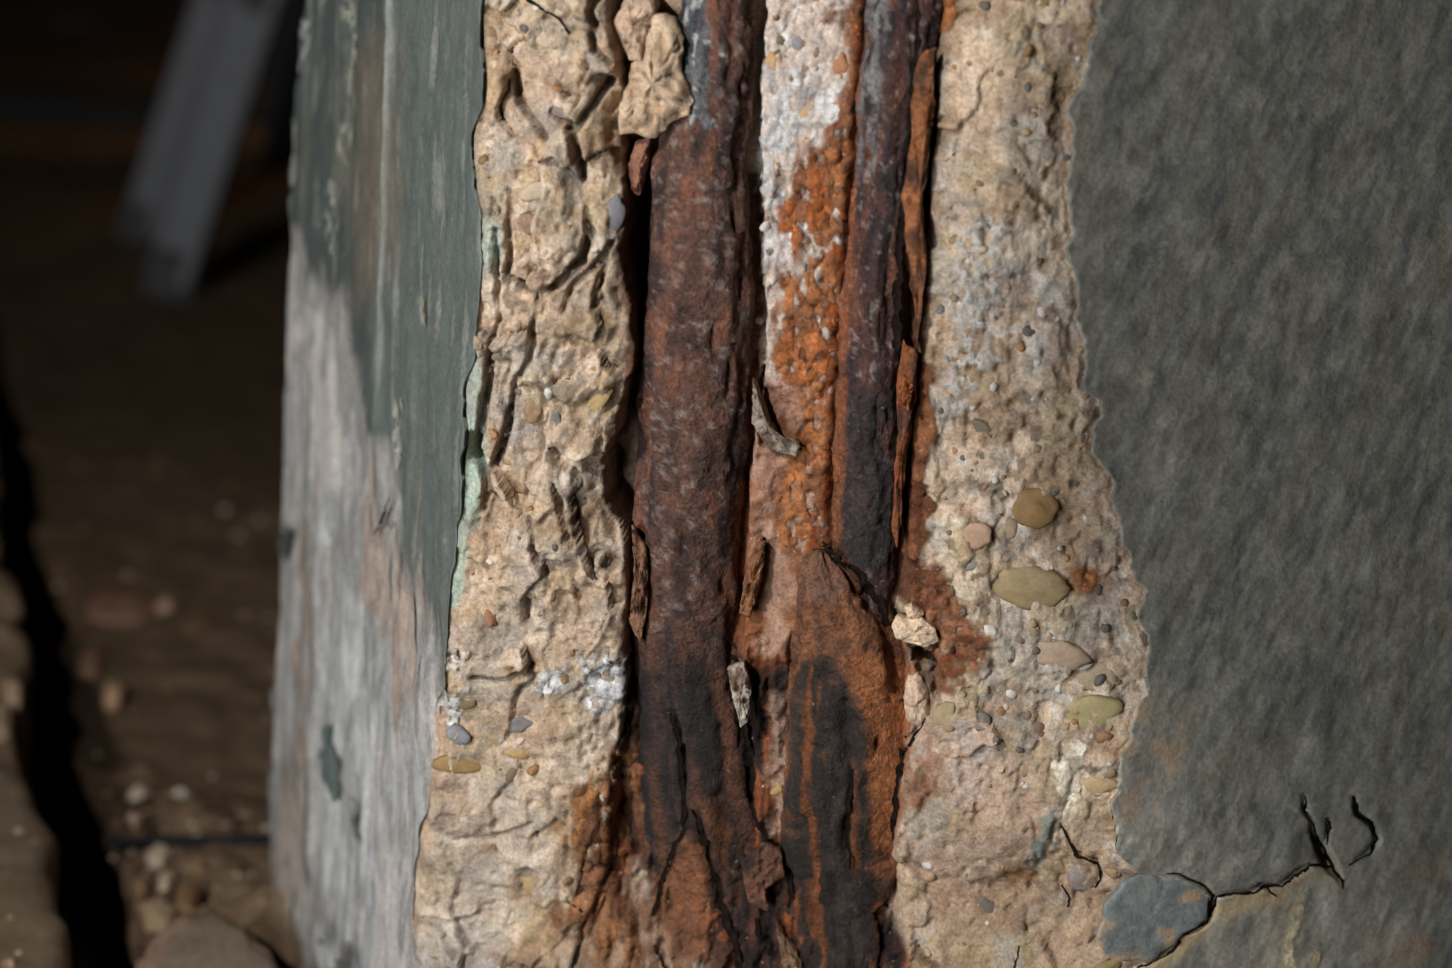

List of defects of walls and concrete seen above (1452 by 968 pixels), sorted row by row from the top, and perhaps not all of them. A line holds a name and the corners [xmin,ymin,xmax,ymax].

corrosion [940,0,957,31]
corrosion [752,2,865,557]
spalling [269,0,1209,968]
corrosion [898,363,992,699]
crack [566,694,633,968]
crack [651,706,795,968]
crack [1061,825,1103,907]
crack [1137,796,1379,968]